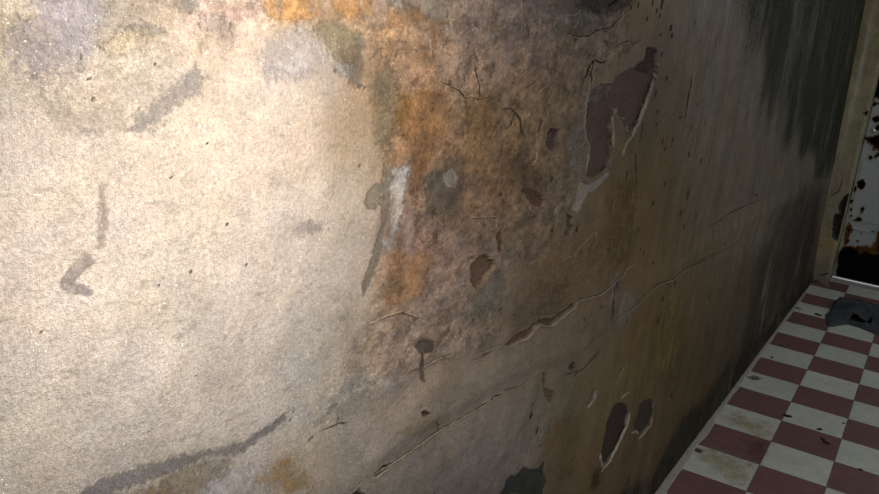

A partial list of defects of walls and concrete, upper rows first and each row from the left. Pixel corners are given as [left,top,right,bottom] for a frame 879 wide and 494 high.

leakage [0,0,267,133]
rust [261,0,323,25]
crack [441,67,540,138]
crack [568,0,638,85]
spalling [567,25,673,232]
rust [865,81,879,160]
rust [384,84,452,306]
leakage [621,0,865,494]
rust [836,179,879,285]
leakage [82,413,286,494]
crack [360,375,535,487]
spalling [597,392,657,472]